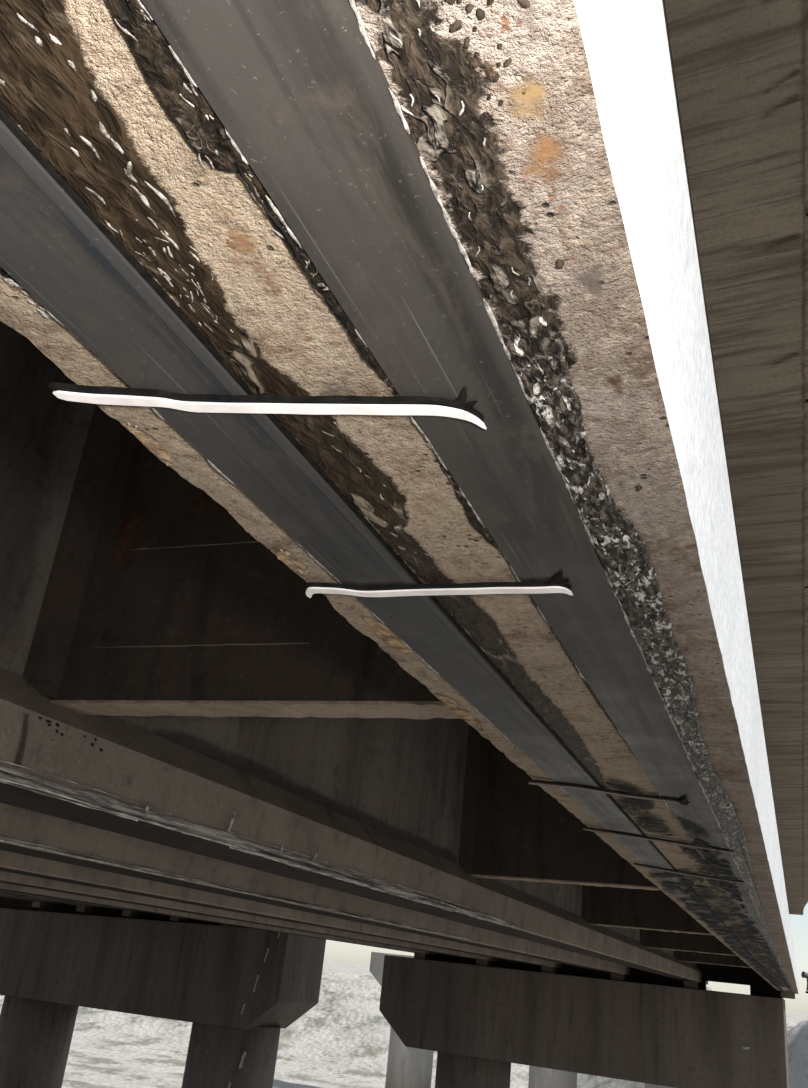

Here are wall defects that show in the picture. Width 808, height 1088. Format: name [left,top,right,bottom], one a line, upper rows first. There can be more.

spalling [271,549,309,575]
peeling [496,316,780,954]
spalling [437,695,489,733]